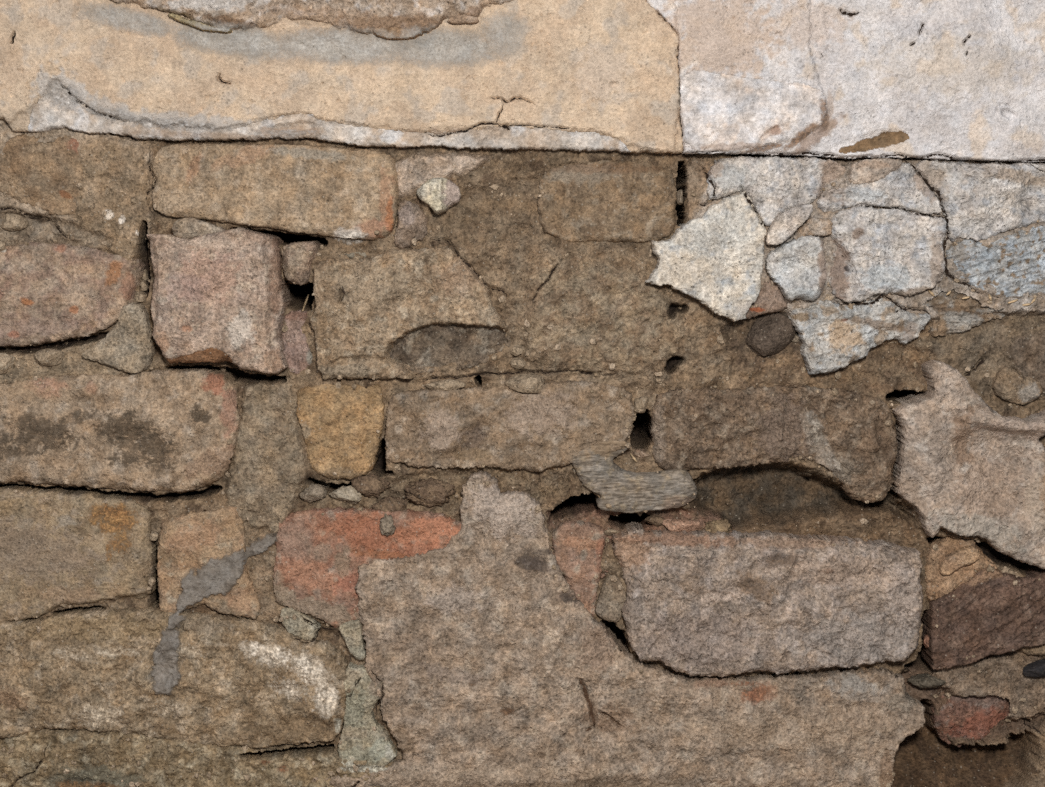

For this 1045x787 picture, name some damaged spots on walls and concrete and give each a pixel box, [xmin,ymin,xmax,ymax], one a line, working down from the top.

crack [425,98,568,137]
crack [686,150,1045,298]
spalling [668,304,687,318]
crack [833,295,930,315]
spalling [664,356,684,373]
spalling [891,699,1035,787]